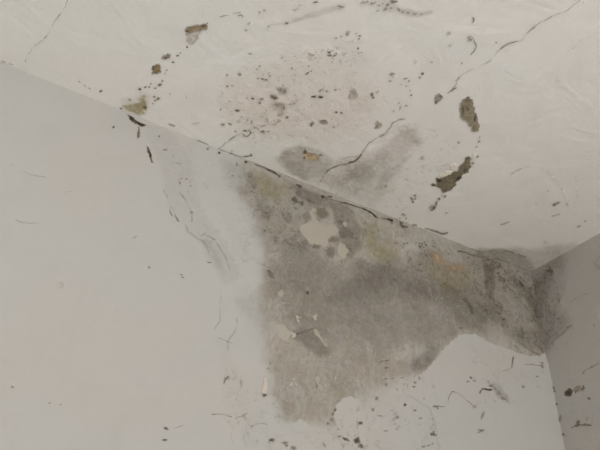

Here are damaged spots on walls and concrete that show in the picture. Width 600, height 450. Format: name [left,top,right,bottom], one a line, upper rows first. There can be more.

spalling [138,22,208,109]
crack [320,154,361,182]
spalling [430,96,480,211]
peeling [300,208,350,259]
leakage [213,45,554,448]